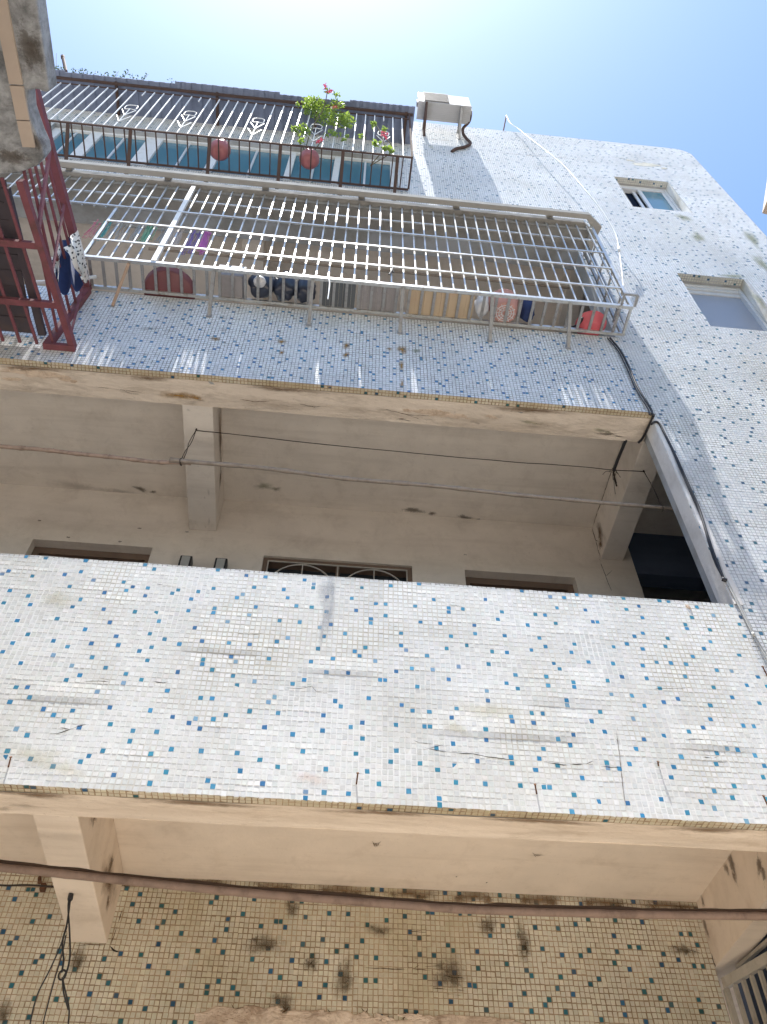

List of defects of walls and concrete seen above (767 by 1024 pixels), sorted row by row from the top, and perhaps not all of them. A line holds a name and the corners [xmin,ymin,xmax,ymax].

crack [416,741,511,760]
crack [546,729,626,808]